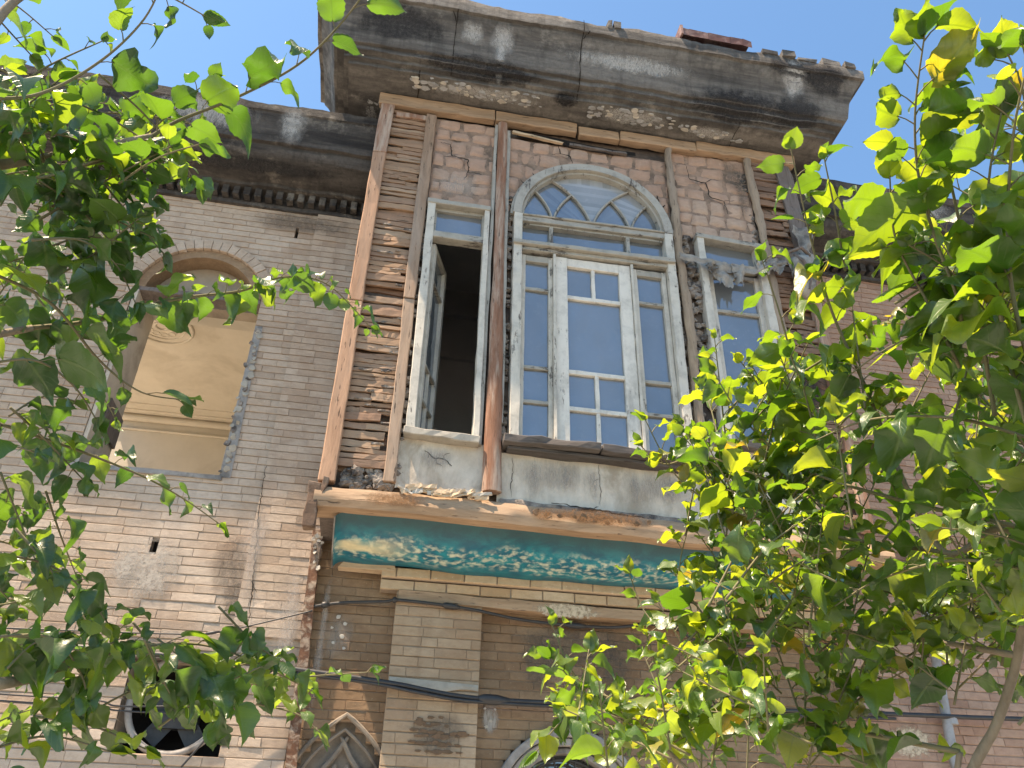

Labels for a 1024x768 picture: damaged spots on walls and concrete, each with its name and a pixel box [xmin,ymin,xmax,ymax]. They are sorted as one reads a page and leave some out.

leakage [486,29,526,85]
crack [577,24,590,102]
peeling [410,76,541,108]
peeling [587,106,743,143]
crack [441,142,481,178]
crack [686,166,728,214]
crack [552,465,646,519]
crack [248,466,267,628]
spalling [408,716,469,755]